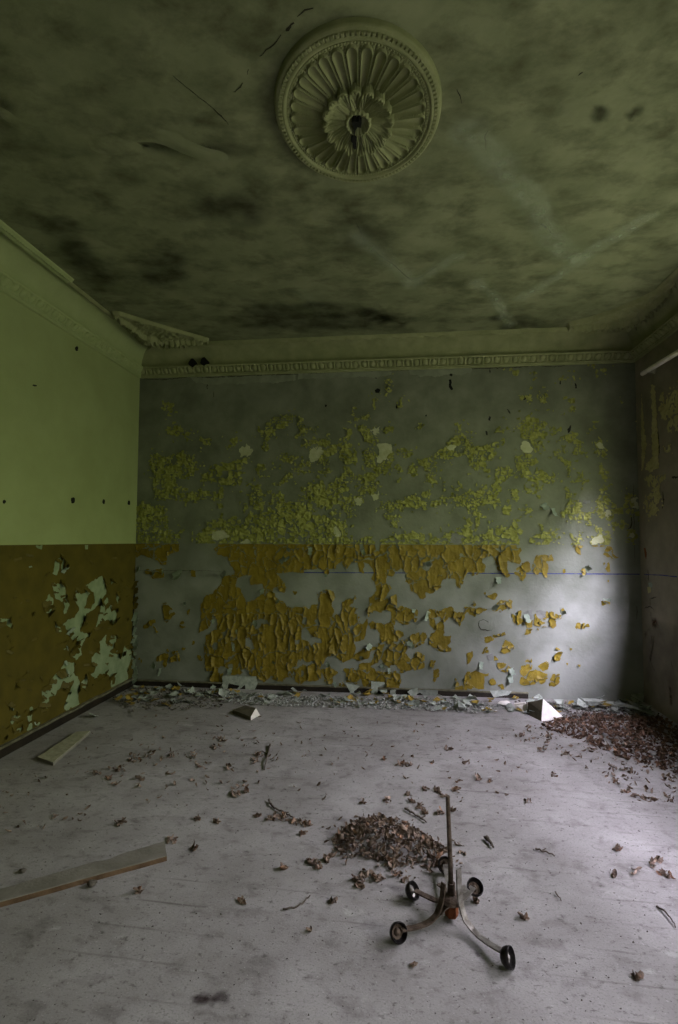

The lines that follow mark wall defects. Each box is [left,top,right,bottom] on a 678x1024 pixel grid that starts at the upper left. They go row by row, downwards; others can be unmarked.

crack [235,8,314,92]
peeling [7,368,678,739]